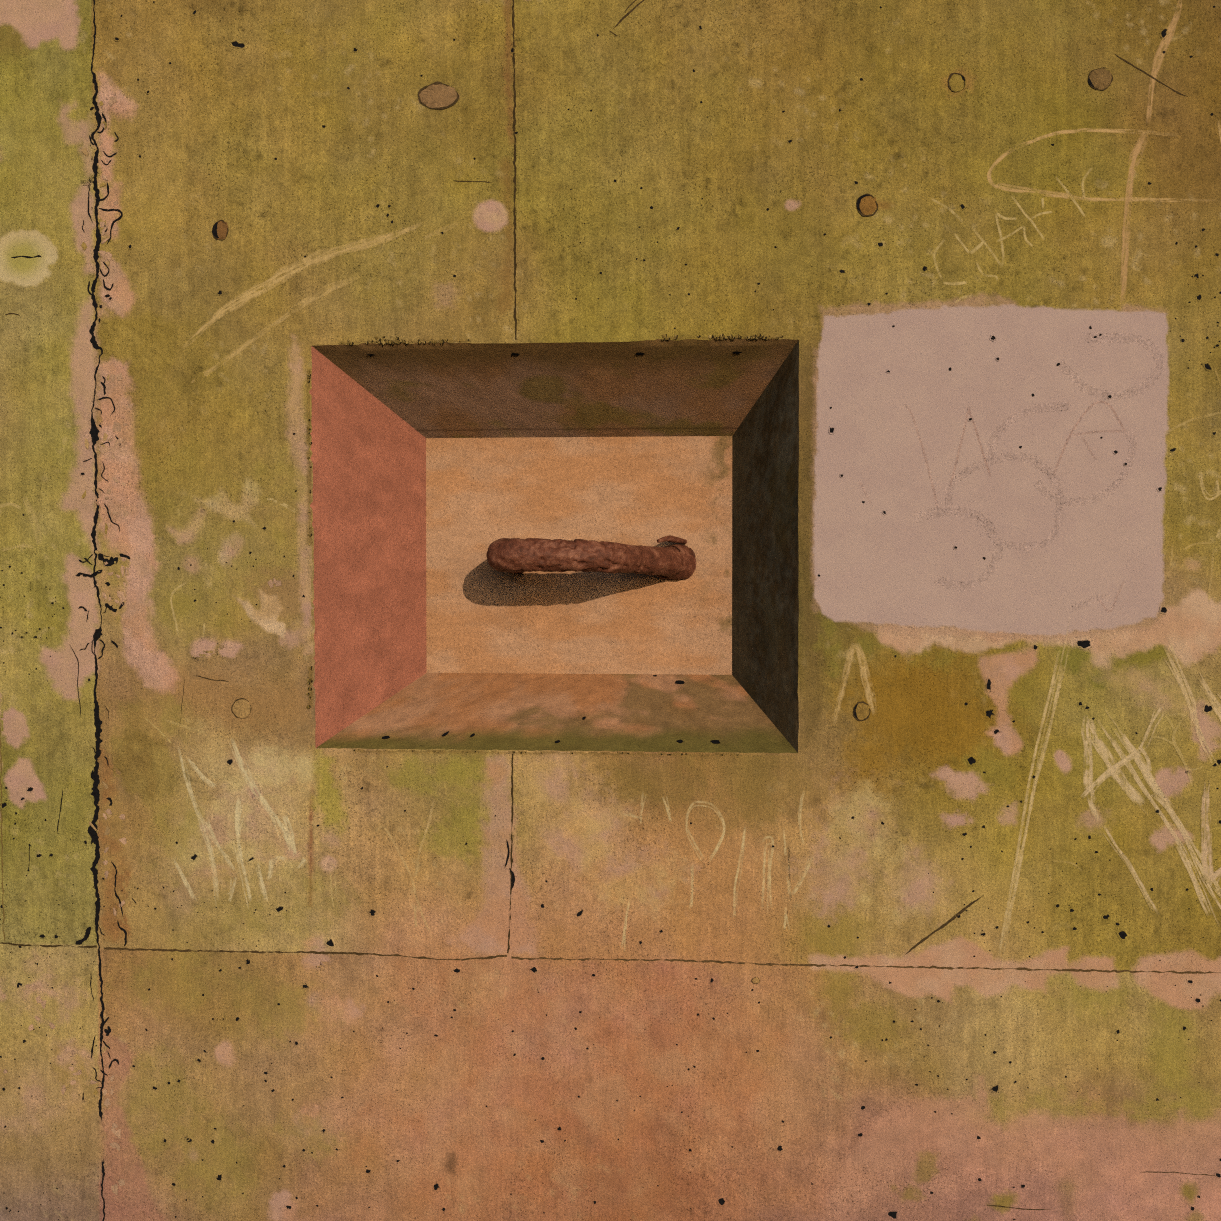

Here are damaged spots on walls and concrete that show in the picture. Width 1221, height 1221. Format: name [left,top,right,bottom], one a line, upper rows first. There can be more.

peeling [0,0,86,54]
spalling [0,64,243,706]
crack [57,0,136,1120]
peeling [0,705,49,830]
spalling [0,745,171,1221]
peeling [778,763,1221,1018]
peeling [874,582,1221,857]
crack [99,1158,107,1221]